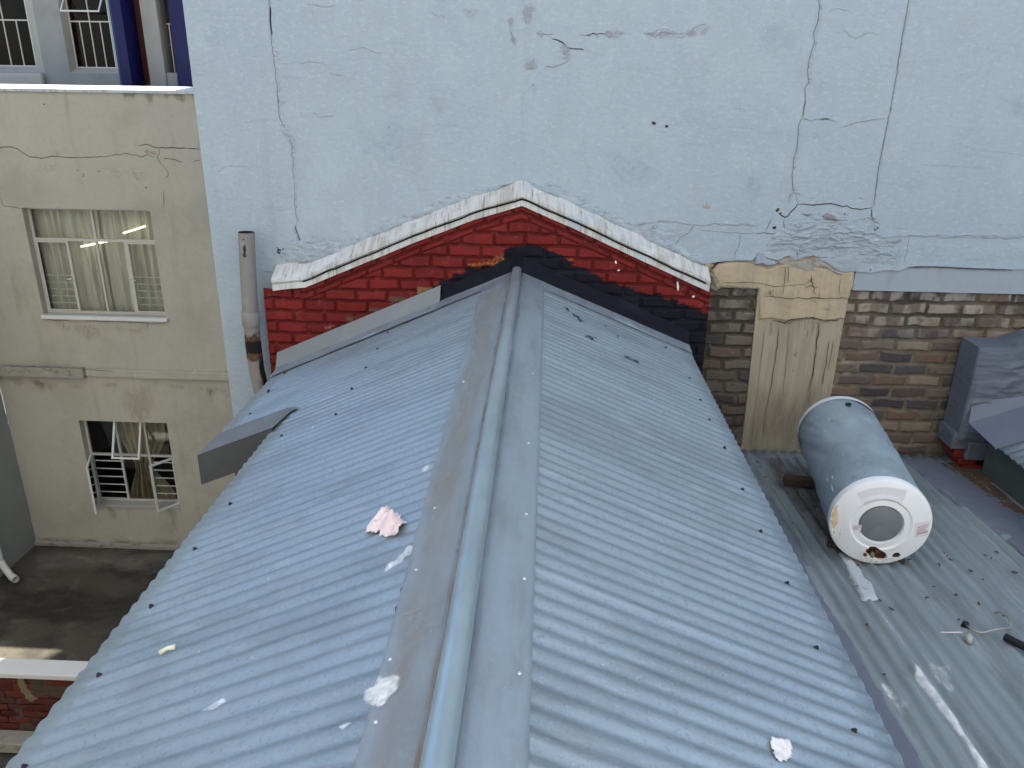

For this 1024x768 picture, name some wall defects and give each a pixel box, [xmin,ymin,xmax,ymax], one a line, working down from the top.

crack [0,144,198,205]
crack [268,0,300,242]
spalling [755,251,871,275]
crack [638,0,1012,440]
rust [244,334,267,385]
flaking render [702,263,758,447]
flaking render [830,290,1024,457]